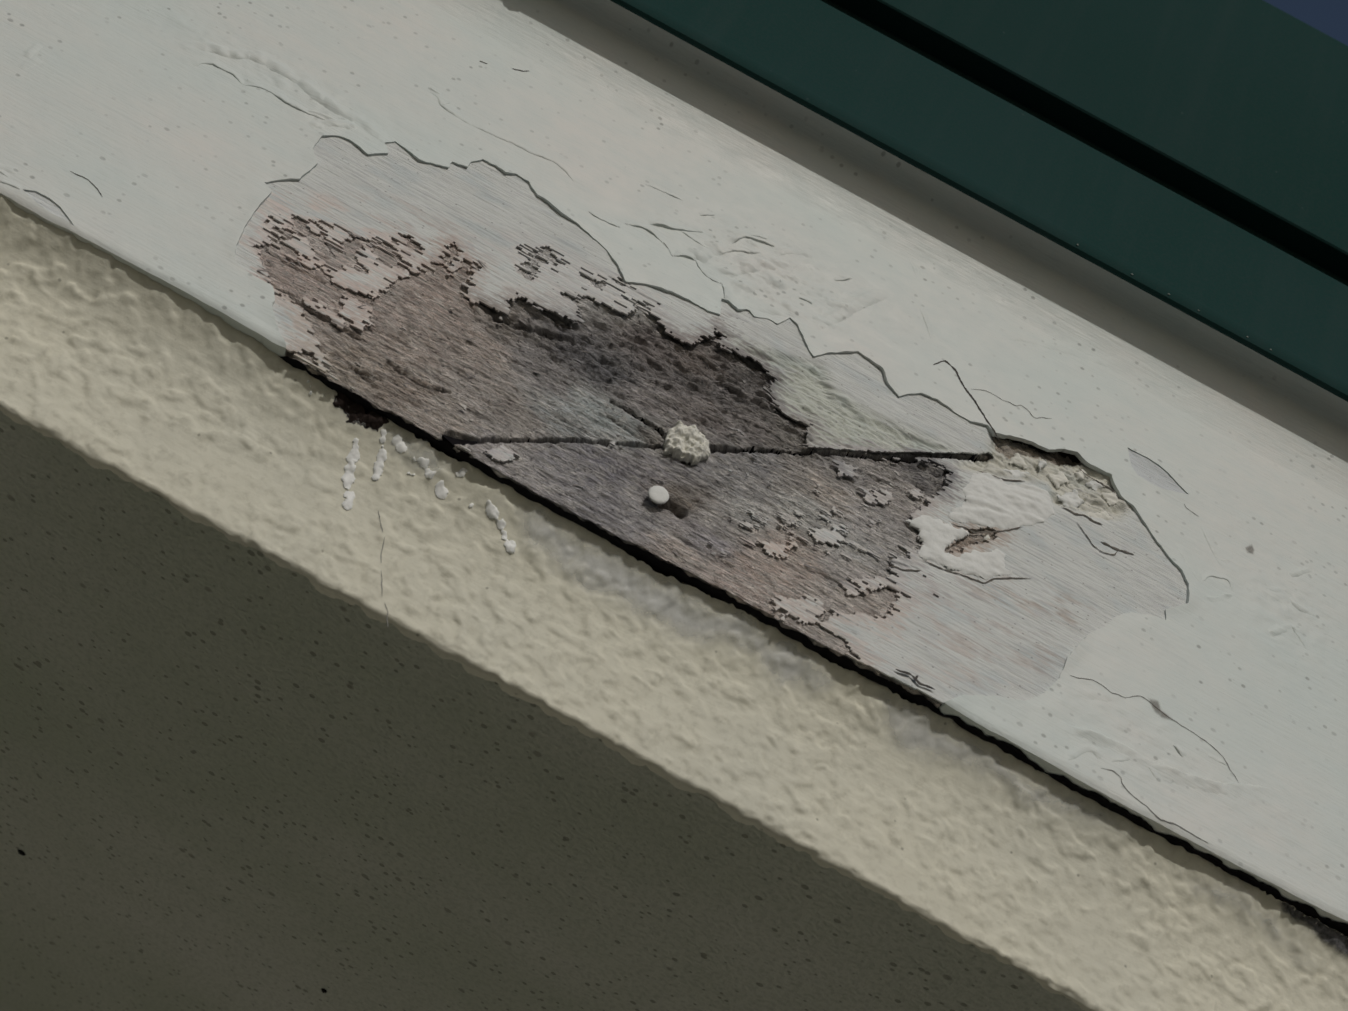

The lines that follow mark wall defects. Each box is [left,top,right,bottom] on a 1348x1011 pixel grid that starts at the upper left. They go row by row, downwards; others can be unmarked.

peeling [235,137,1187,708]